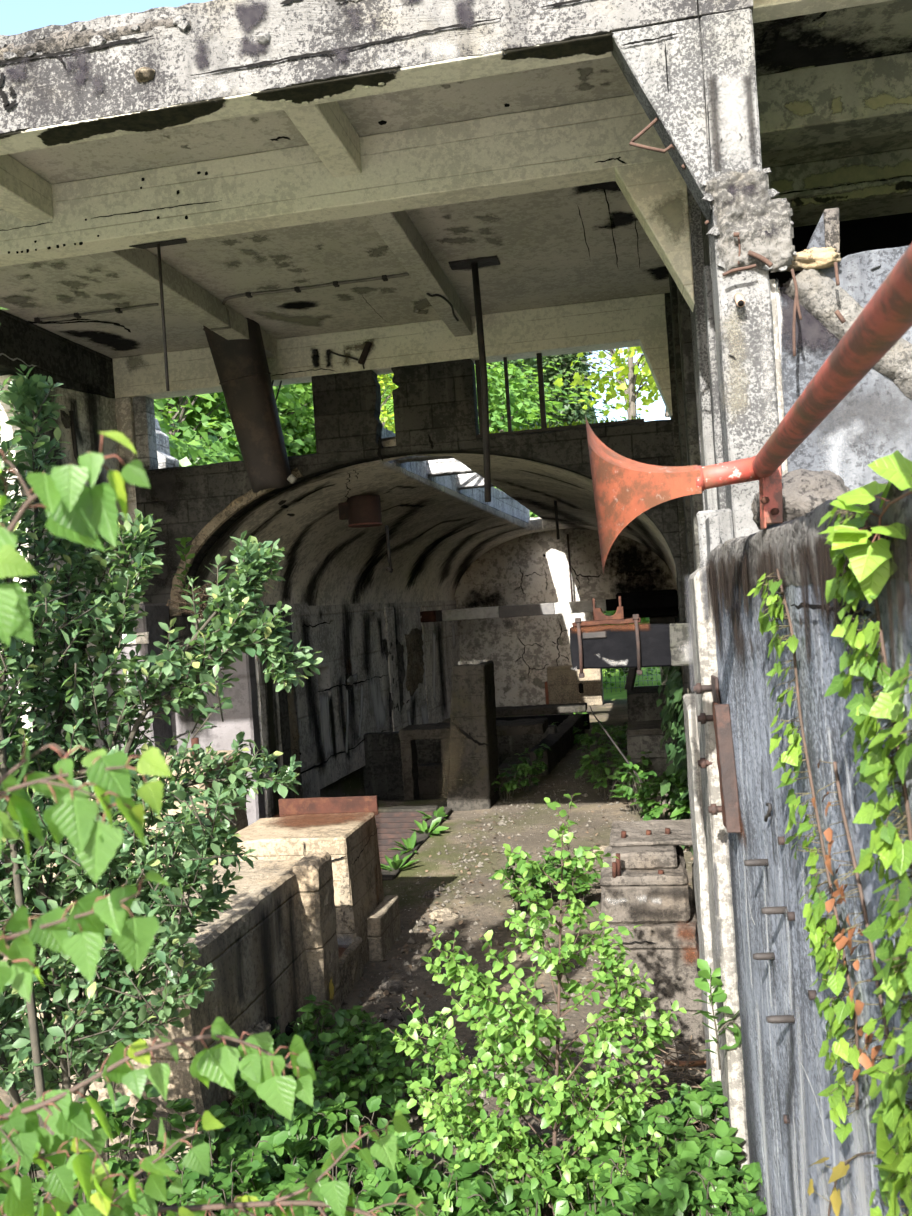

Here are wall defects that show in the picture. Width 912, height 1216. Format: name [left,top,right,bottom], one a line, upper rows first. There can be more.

peeling [250,64,403,104]
peeling [0,97,226,146]
spalling [629,117,675,153]
peeling [895,181,912,191]
spalling [699,166,848,357]
damp [882,520,912,673]
damp [686,535,853,747]